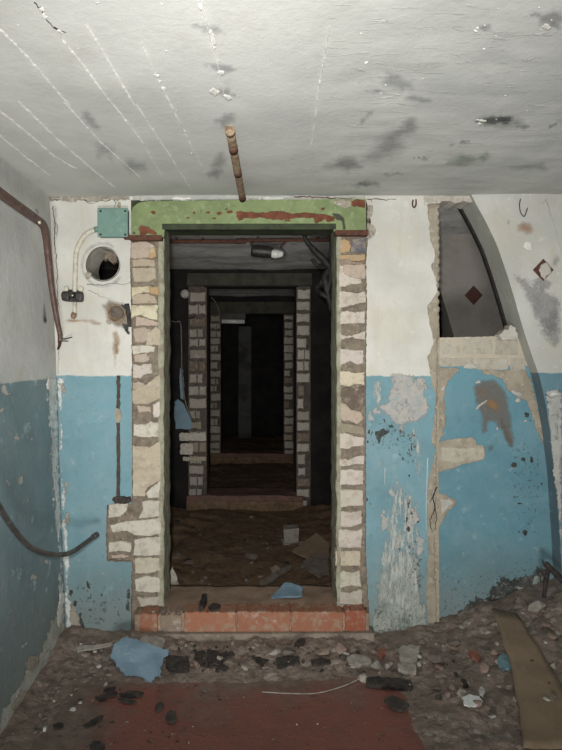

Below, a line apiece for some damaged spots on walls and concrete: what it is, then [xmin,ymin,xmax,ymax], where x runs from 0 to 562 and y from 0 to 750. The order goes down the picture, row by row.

corrosion [187,207,345,229]
water stain [522,278,559,344]
peeling [367,205,562,634]
corrosion [475,380,512,443]
crack [429,487,438,530]
flaking render [0,377,130,735]